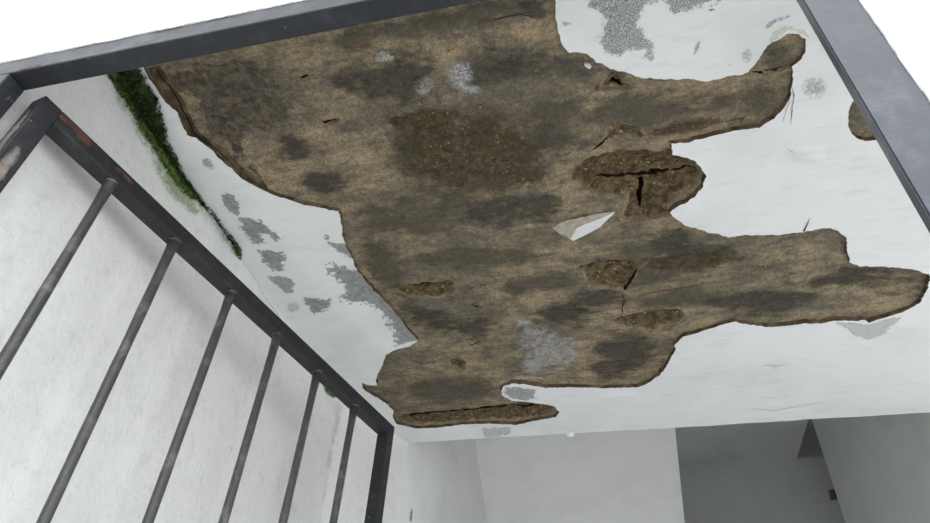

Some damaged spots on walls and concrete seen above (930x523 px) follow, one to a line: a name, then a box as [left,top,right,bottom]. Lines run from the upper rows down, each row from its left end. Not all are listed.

water stain [302,172,345,194]
water stain [357,94,574,233]
flaking render [144,0,930,437]
crack [622,285,702,315]
water stain [413,229,914,405]